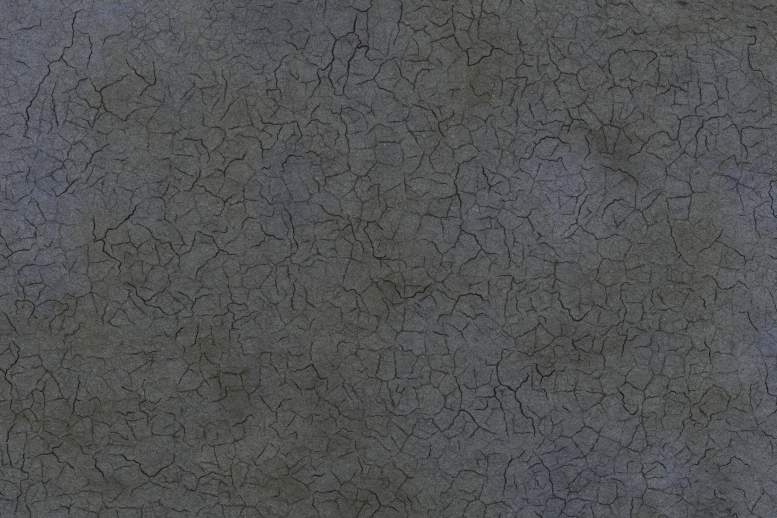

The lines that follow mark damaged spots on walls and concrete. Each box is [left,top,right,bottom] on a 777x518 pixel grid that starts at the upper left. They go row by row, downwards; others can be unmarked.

crack [0,9,202,140]
crack [0,229,254,516]
crack [93,182,328,476]
crack [309,409,594,518]
crack [178,0,777,453]
crack [595,334,750,518]